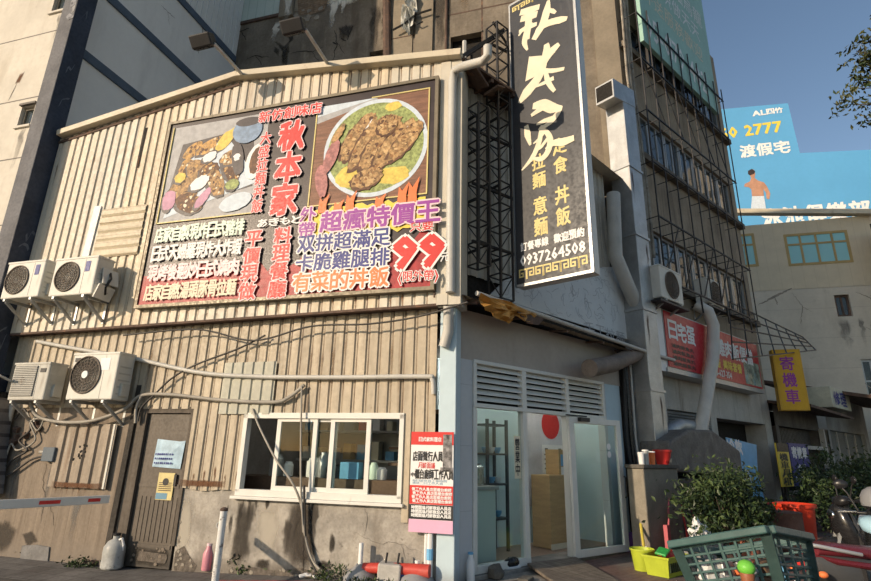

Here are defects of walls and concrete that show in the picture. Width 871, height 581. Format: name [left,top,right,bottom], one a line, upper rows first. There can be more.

crack [759,288,812,321]
damp [229,501,330,570]